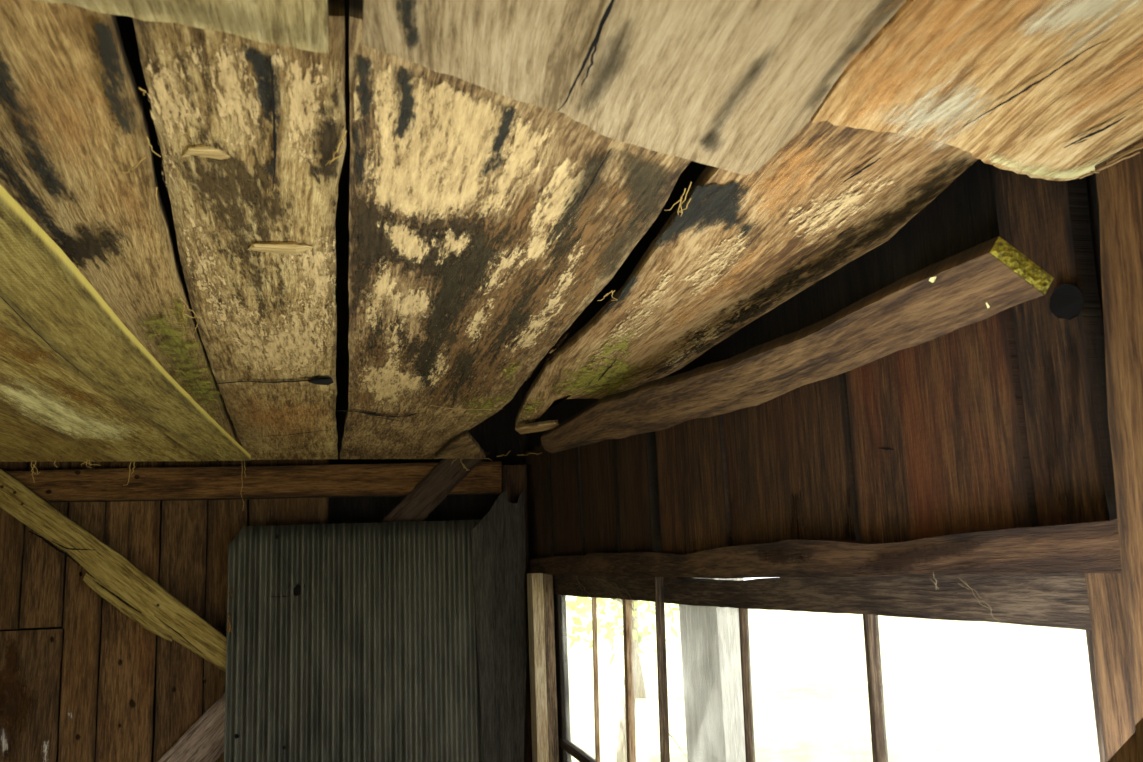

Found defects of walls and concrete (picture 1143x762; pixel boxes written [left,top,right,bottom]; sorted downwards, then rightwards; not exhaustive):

leakage [93,23,135,147]
leakage [396,0,419,50]
crack [557,0,615,111]
leakage [590,40,622,100]
leakage [0,52,129,271]
leakage [167,33,295,334]
leakage [309,56,609,405]
leakage [602,153,666,278]
leakage [598,275,638,319]